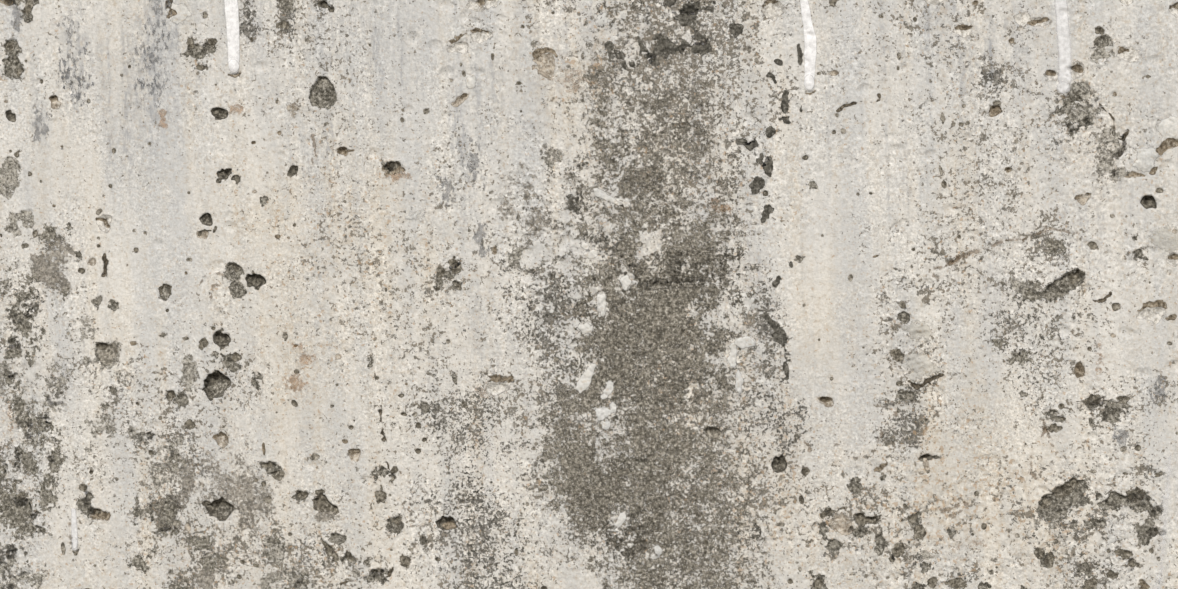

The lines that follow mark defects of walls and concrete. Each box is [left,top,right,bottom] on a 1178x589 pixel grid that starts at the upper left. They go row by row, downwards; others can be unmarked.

damp [395,0,814,589]